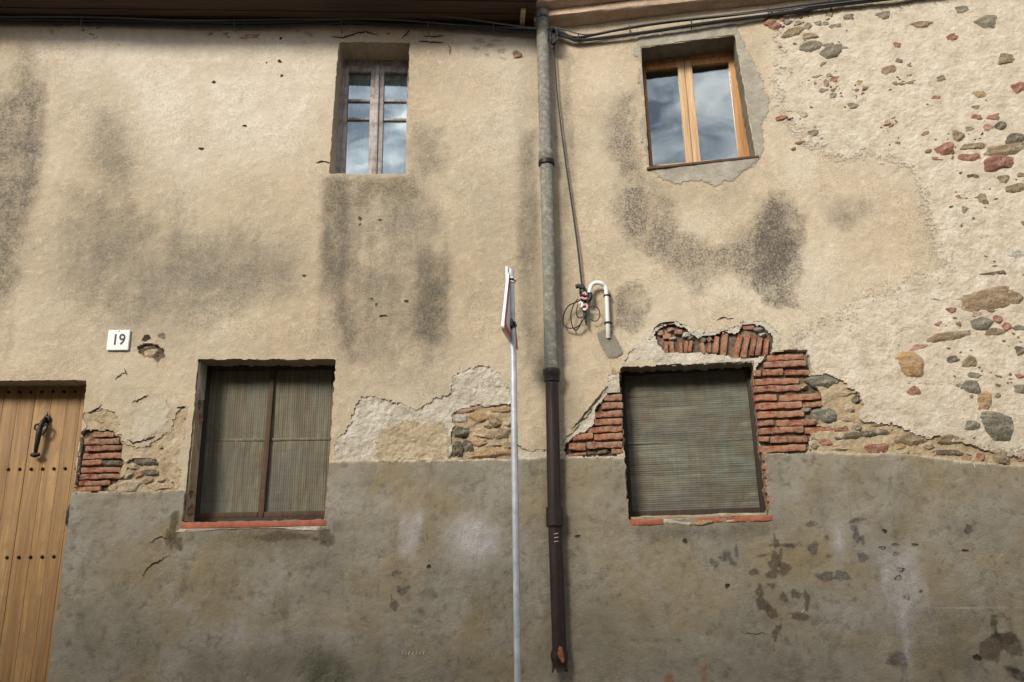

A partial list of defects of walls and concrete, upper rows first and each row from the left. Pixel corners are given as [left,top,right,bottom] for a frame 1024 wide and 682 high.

leakage [0,79,38,290]
leakage [620,185,801,305]
flaking render [560,0,1024,470]
flaking render [139,344,165,362]
flaking render [74,396,188,494]
flaking render [333,366,547,465]
crack [142,536,170,576]